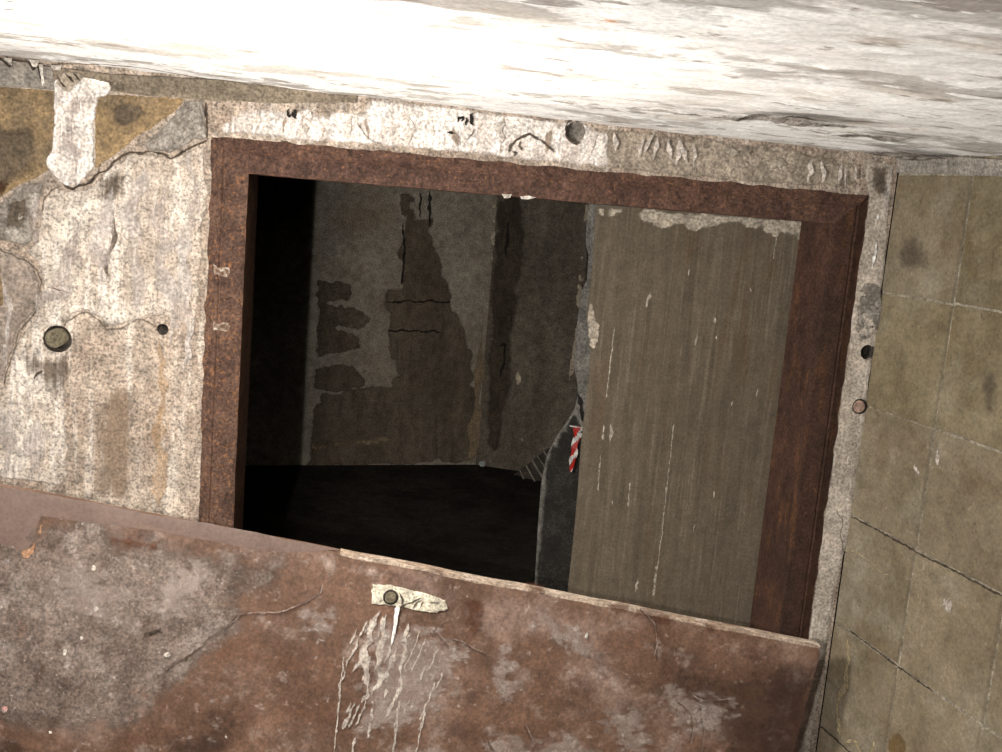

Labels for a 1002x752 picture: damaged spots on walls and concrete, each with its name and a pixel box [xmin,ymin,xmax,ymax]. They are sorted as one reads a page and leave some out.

crack [42,63,272,211]
spalling [146,100,206,153]
peeling [0,183,43,380]
corrosion [466,334,485,459]
damp [488,197,523,451]
peeling [0,486,340,734]
crack [836,510,1002,596]
crack [819,725,851,752]